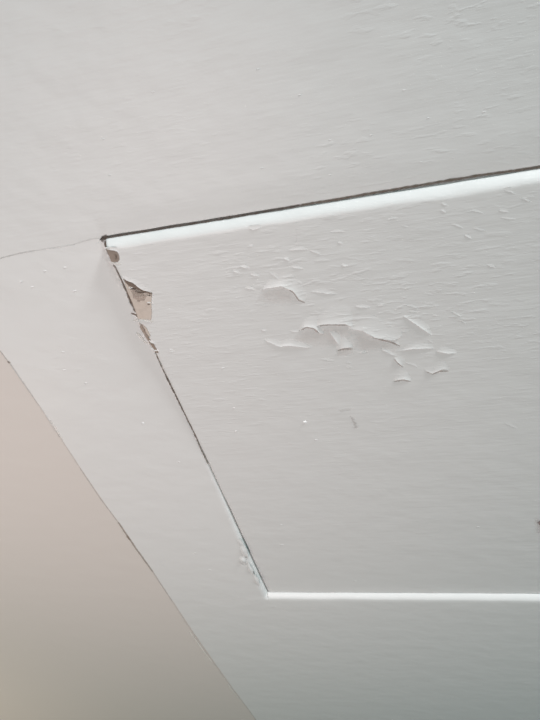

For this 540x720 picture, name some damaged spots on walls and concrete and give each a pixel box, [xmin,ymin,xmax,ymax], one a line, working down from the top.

peeling [105,247,120,266]
peeling [122,276,174,353]
peeling [262,304,457,381]